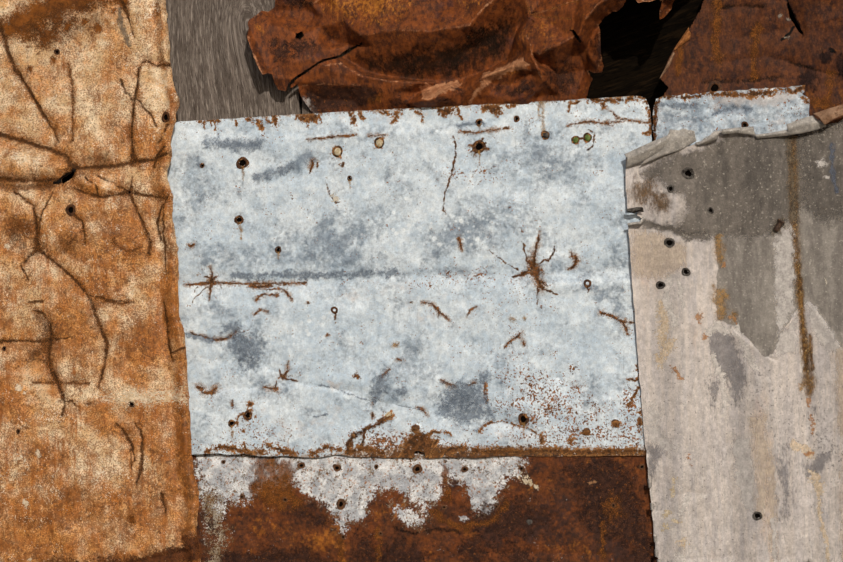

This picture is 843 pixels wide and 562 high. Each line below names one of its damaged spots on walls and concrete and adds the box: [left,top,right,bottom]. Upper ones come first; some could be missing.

rust [0,0,130,63]
rust [0,56,171,199]
rust [234,115,279,131]
rust [294,83,383,167]
rust [432,59,577,160]
rust [567,0,843,145]
crack [781,0,804,41]
rust [489,234,558,305]
rust [772,135,816,434]
rust [624,364,643,433]
rust [42,375,658,562]
peeling [193,451,538,562]